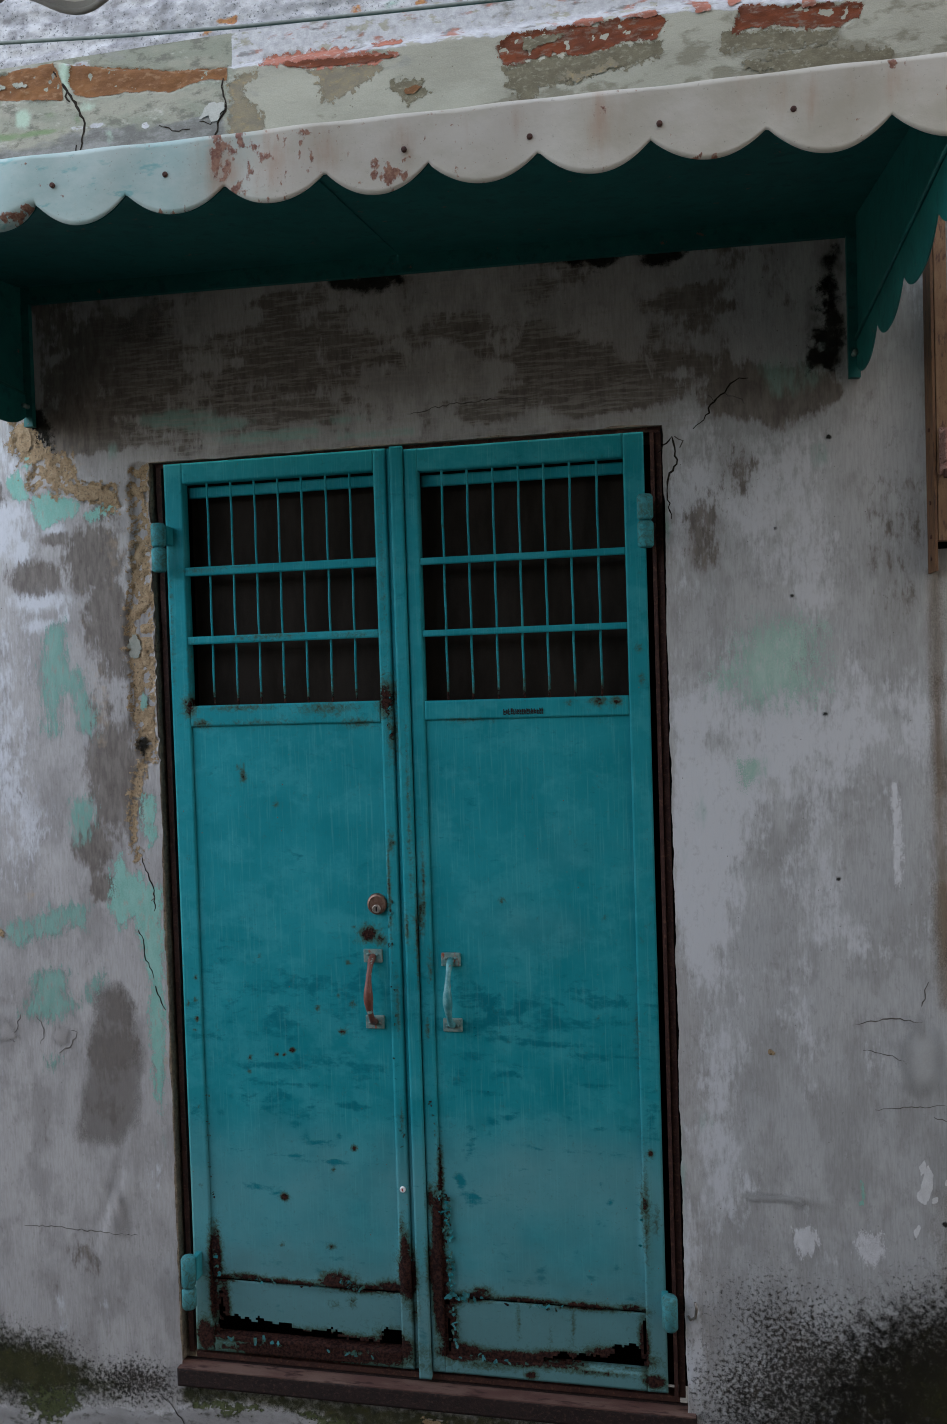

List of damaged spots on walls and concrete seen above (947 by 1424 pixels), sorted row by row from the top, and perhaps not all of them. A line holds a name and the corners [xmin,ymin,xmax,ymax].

crack [53,71,86,151]
crack [159,78,227,135]
flaking render [0,38,432,134]
flaking render [495,10,669,101]
flaking render [692,1,711,13]
peeling [719,0,894,74]
flaking render [3,420,159,865]
crack [138,858,166,1010]
leakage [81,985,139,1142]
leakage [0,1322,264,1424]
leakage [688,1267,947,1424]